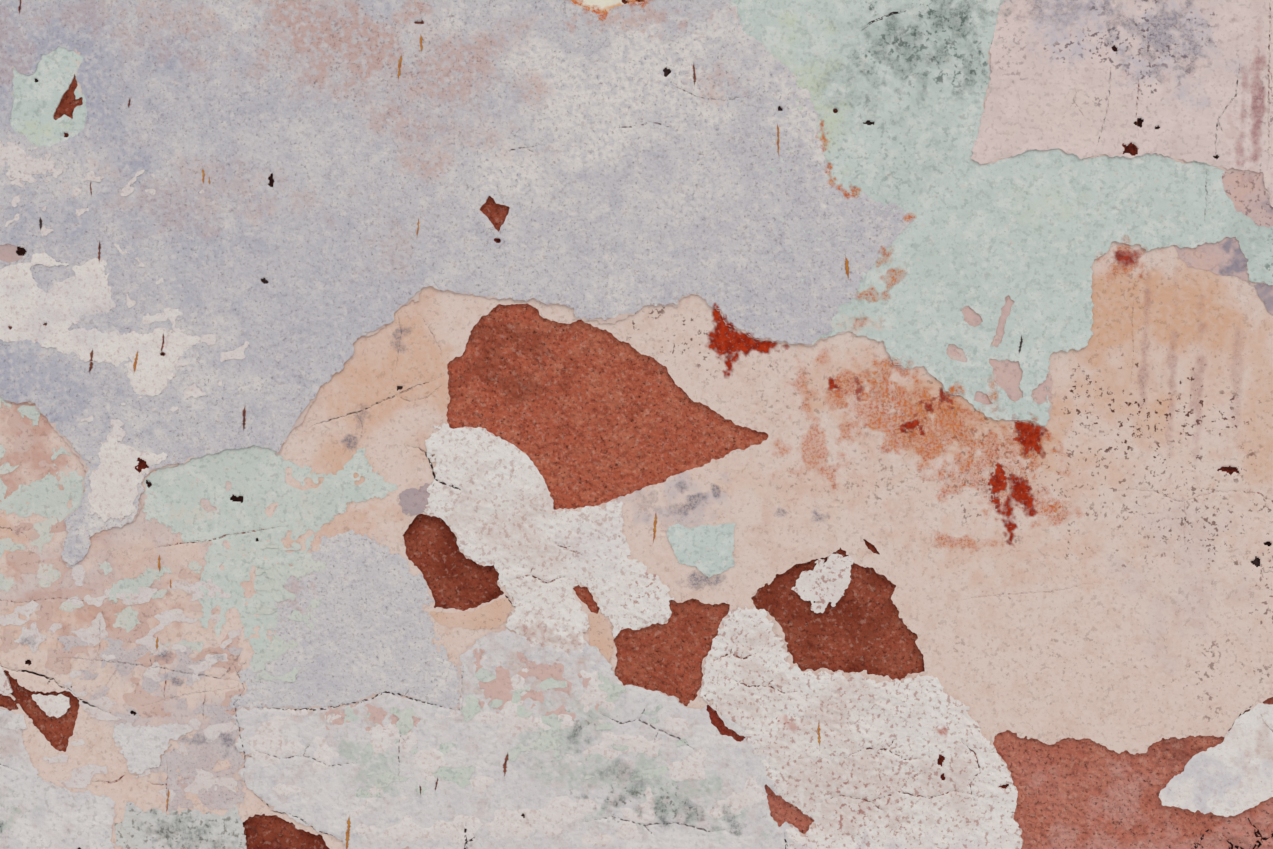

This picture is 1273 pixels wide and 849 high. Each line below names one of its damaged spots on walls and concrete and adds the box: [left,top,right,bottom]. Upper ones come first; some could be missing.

peeling [0,0,1273,587]
corrosion [709,303,788,376]
corrosion [828,360,1061,544]
peeling [0,445,814,849]
spalling [751,539,925,680]